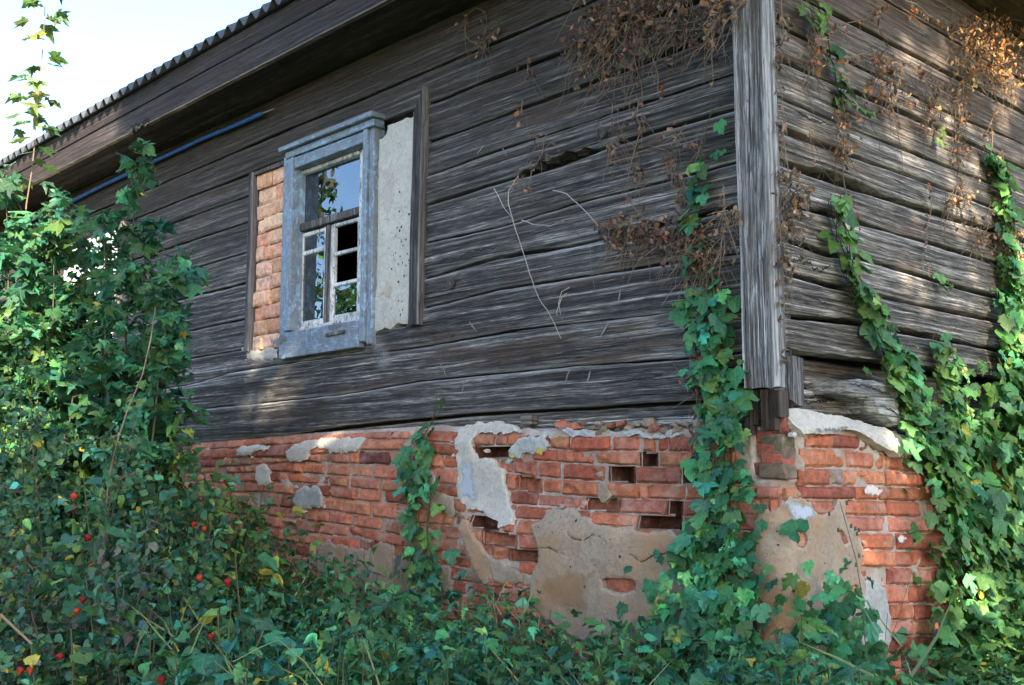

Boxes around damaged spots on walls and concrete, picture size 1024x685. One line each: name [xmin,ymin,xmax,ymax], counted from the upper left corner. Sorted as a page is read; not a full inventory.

spalling [572,418,707,439]
spalling [475,430,515,464]
spalling [754,417,797,479]
spalling [596,452,659,483]
spalling [517,475,543,493]
spalling [575,497,622,522]
spalling [636,501,684,530]
spalling [469,515,539,561]
spalling [606,578,636,593]